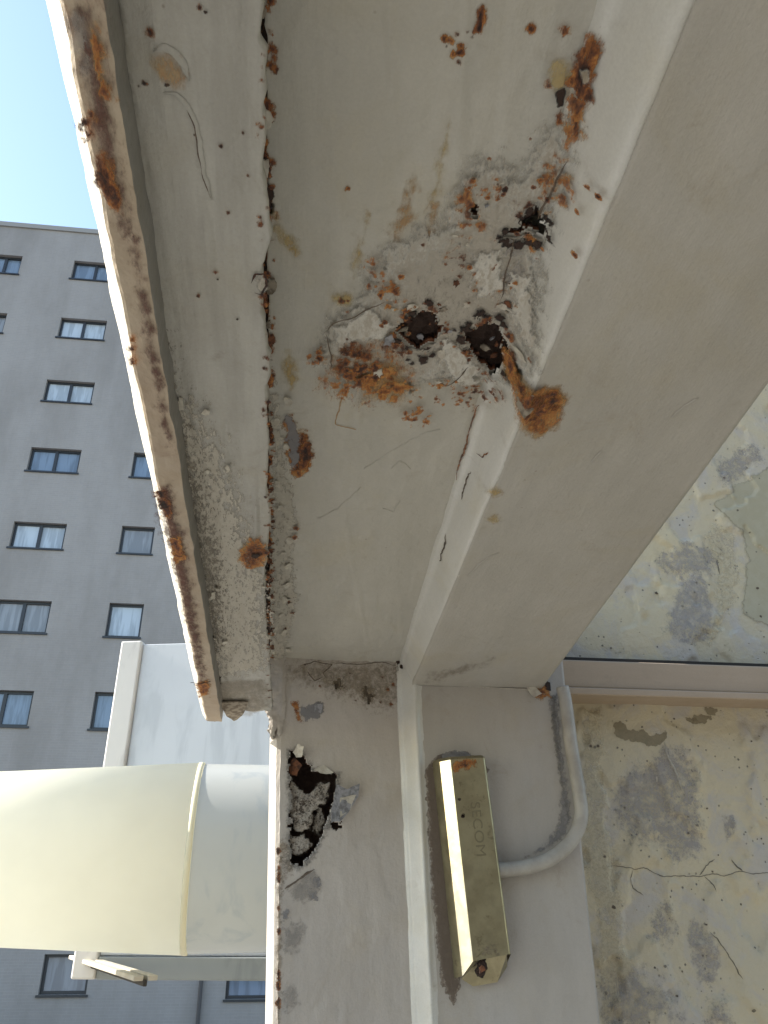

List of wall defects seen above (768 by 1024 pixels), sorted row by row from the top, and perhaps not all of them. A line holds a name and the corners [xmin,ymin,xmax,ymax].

corrosion [545,33,604,150]
corrosion [65,7,145,280]
crack [187,111,210,196]
spalling [306,116,602,430]
corrosion [502,347,567,439]
corrosion [239,259,315,658]
crack [456,405,488,500]
corrosion [153,486,211,698]
leakage [613,721,667,746]
leakage [686,707,718,724]
crack [584,859,768,895]
crack [710,932,743,979]